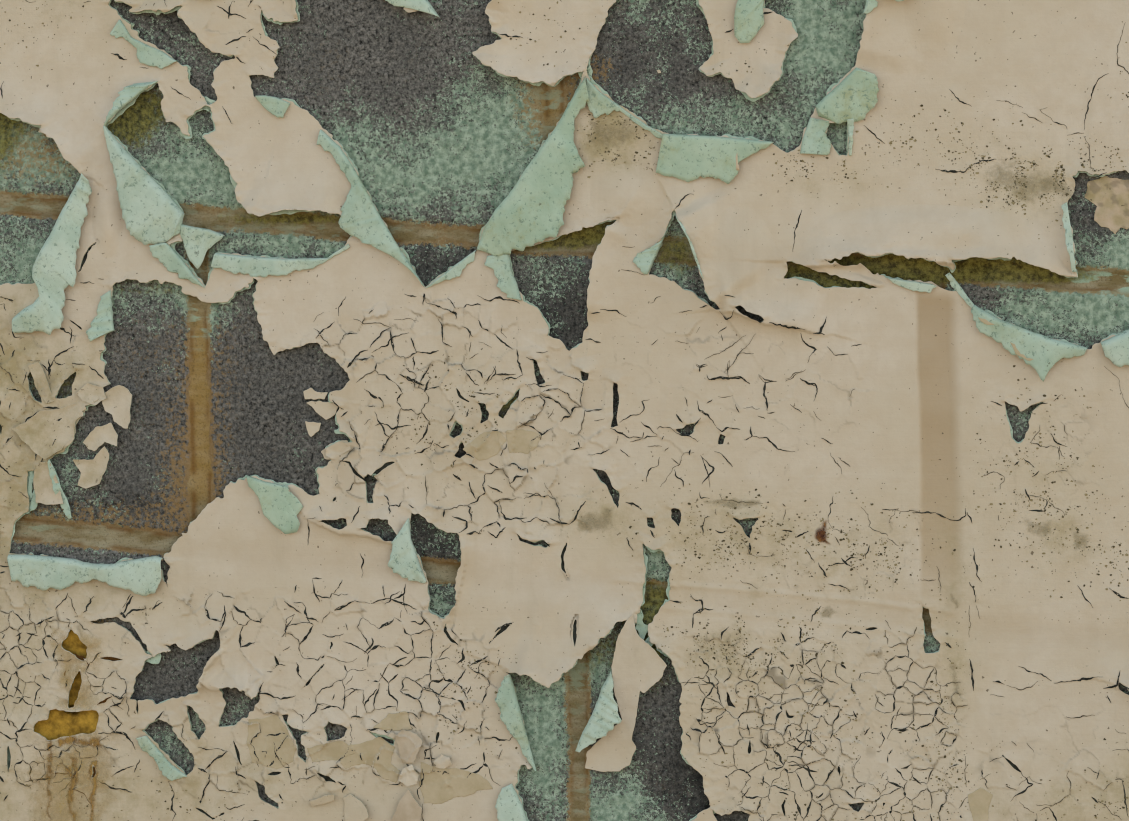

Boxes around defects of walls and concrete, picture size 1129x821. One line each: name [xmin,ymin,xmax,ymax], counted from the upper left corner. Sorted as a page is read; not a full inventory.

crack [0,243,115,498]
peeling [91,544,750,821]
peeling [0,0,879,596]
crack [308,246,1129,821]
peeling [922,607,940,653]
peeling [784,170,1129,382]
peeling [1005,402,1043,444]